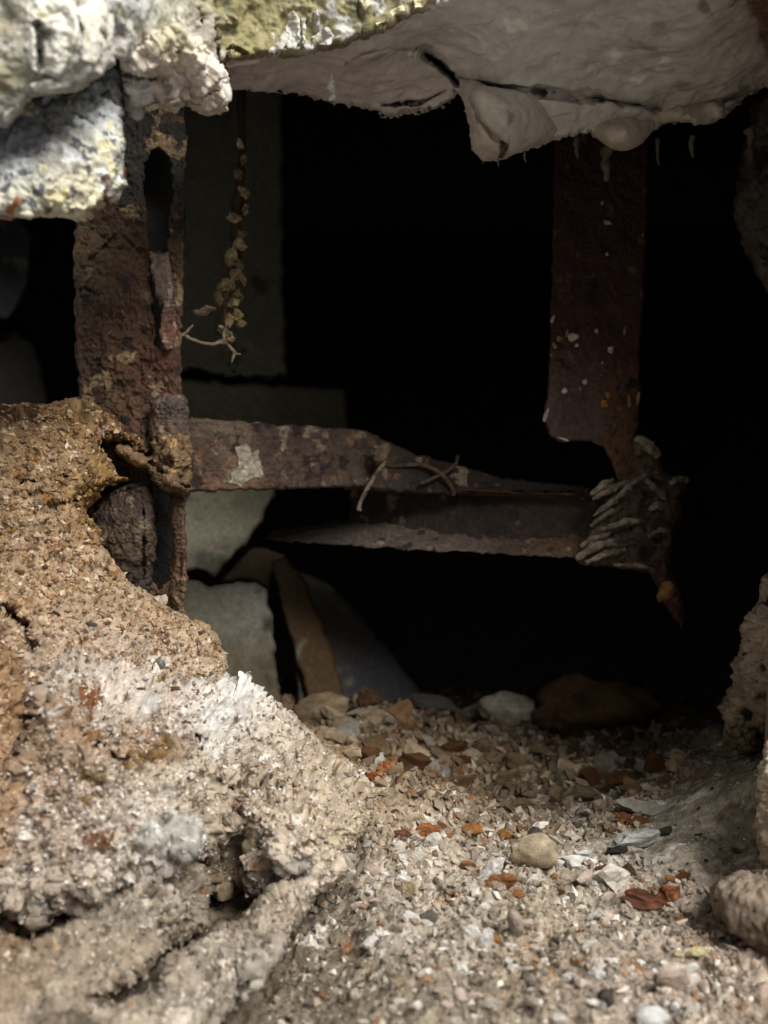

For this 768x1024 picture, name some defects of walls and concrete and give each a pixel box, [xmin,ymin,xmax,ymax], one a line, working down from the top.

peeling [2,104,25,123]
peeling [24,0,115,93]
spalling [119,22,232,121]
peeling [326,74,337,101]
crack [425,53,514,89]
crack [545,92,638,107]
corrosion [90,173,112,216]
corrosion [149,251,178,351]
corrosion [168,494,187,613]
water stain [177,676,251,741]